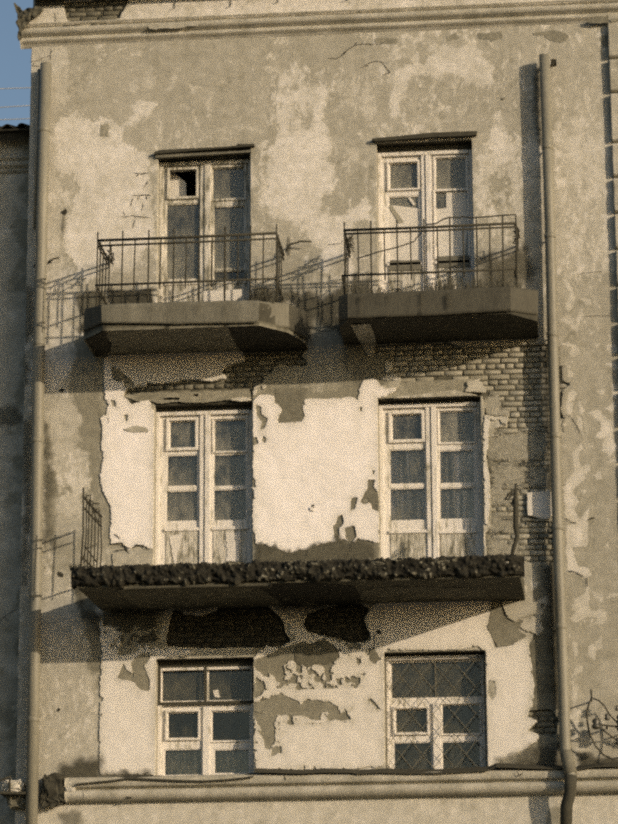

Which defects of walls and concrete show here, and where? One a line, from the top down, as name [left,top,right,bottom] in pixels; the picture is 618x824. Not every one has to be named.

crack [328,42,390,75]
flaking render [533,30,569,43]
peeling [550,76,617,277]
peeling [41,28,553,590]
peeling [558,282,618,755]
peeling [99,596,559,776]